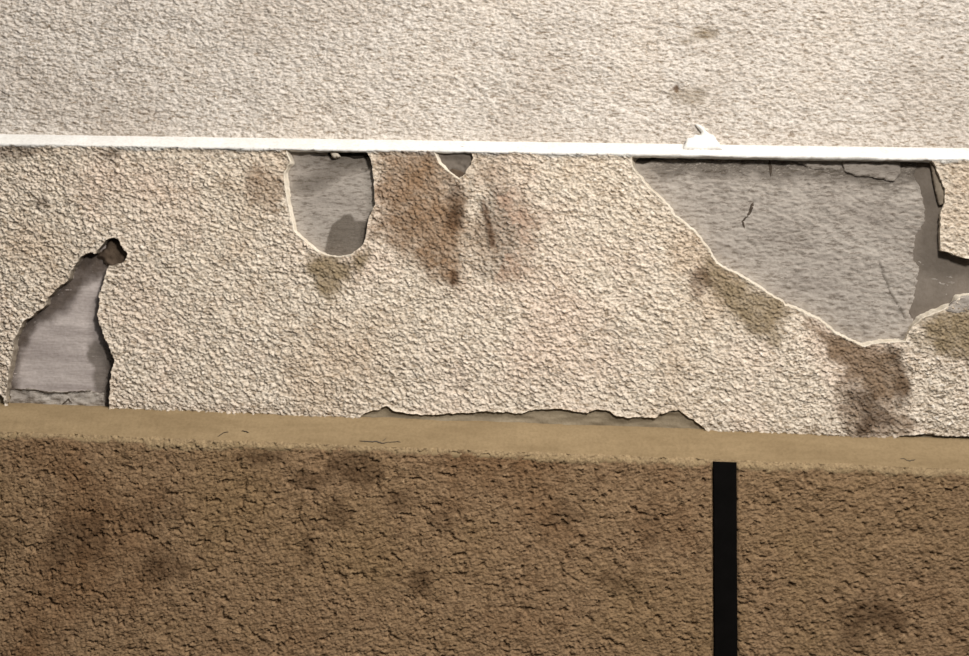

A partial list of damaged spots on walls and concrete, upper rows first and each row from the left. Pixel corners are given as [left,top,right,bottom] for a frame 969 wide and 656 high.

spalling [284,150,375,257]
water stain [374,153,463,284]
spalling [434,146,473,179]
spalling [630,156,969,348]
spalling [0,238,127,407]
spalling [361,406,705,429]
water stain [819,332,909,436]